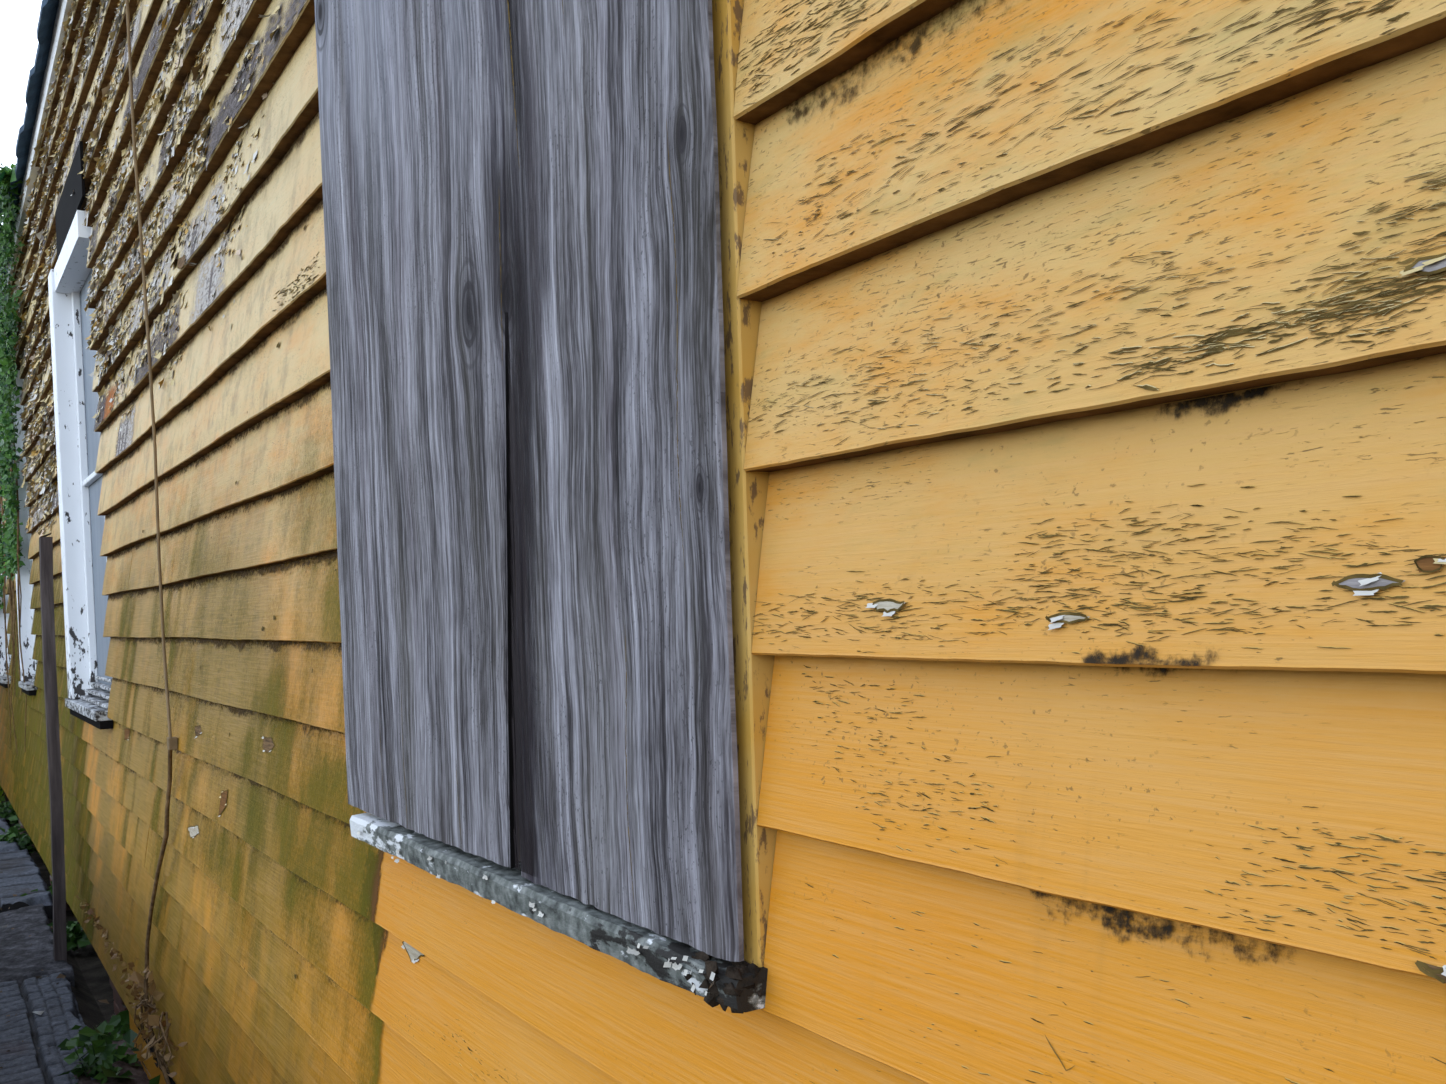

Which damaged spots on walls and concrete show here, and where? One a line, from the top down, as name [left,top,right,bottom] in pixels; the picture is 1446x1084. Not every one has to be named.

peeling [5,0,306,537]
leakage [105,111,323,389]
crack [734,0,890,106]
crack [763,0,1408,269]
crack [751,164,1446,446]
leakage [5,541,95,944]
leakage [106,464,388,1084]
peeling [866,598,905,616]
peeling [1045,612,1089,630]
peeling [1331,555,1446,596]
peeling [663,956,715,995]
leakage [1030,890,1283,962]